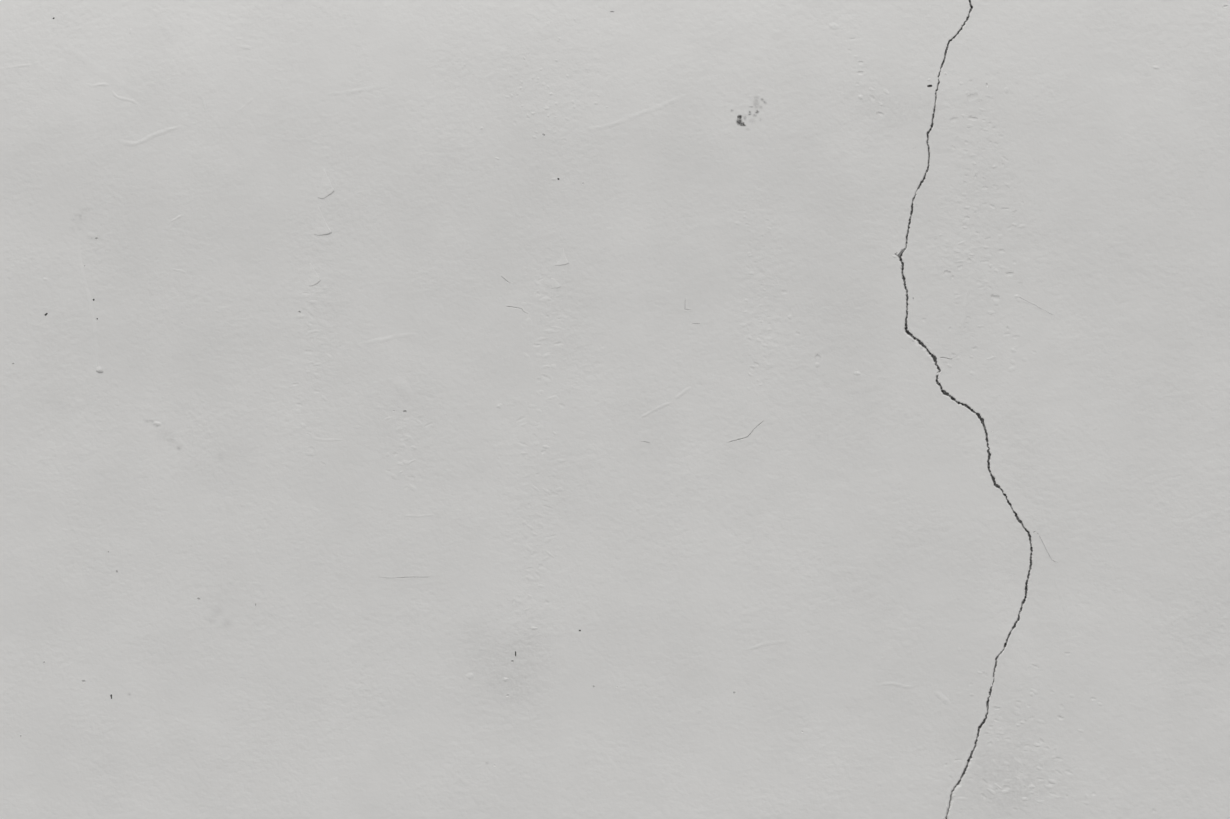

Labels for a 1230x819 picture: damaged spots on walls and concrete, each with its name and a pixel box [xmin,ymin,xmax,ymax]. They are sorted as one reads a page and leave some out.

crack [892,0,1058,819]